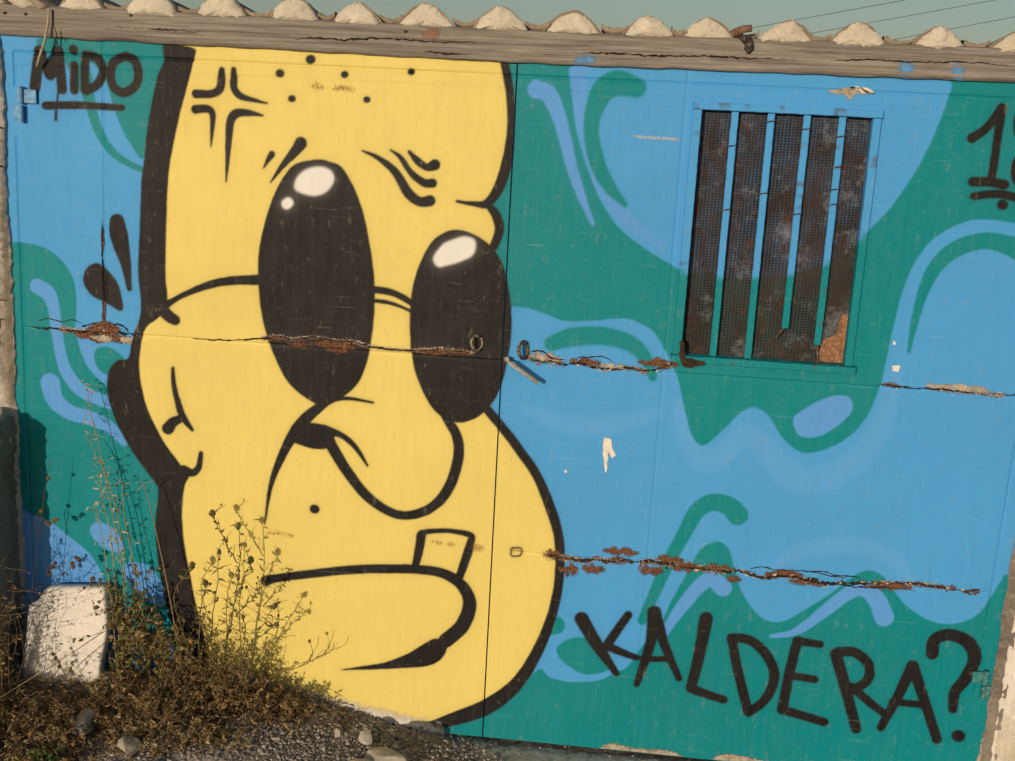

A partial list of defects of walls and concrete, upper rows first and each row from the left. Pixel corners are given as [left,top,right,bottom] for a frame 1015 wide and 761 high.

rust [60,321,129,344]
rust [679,341,705,369]
peeling [603,437,616,472]